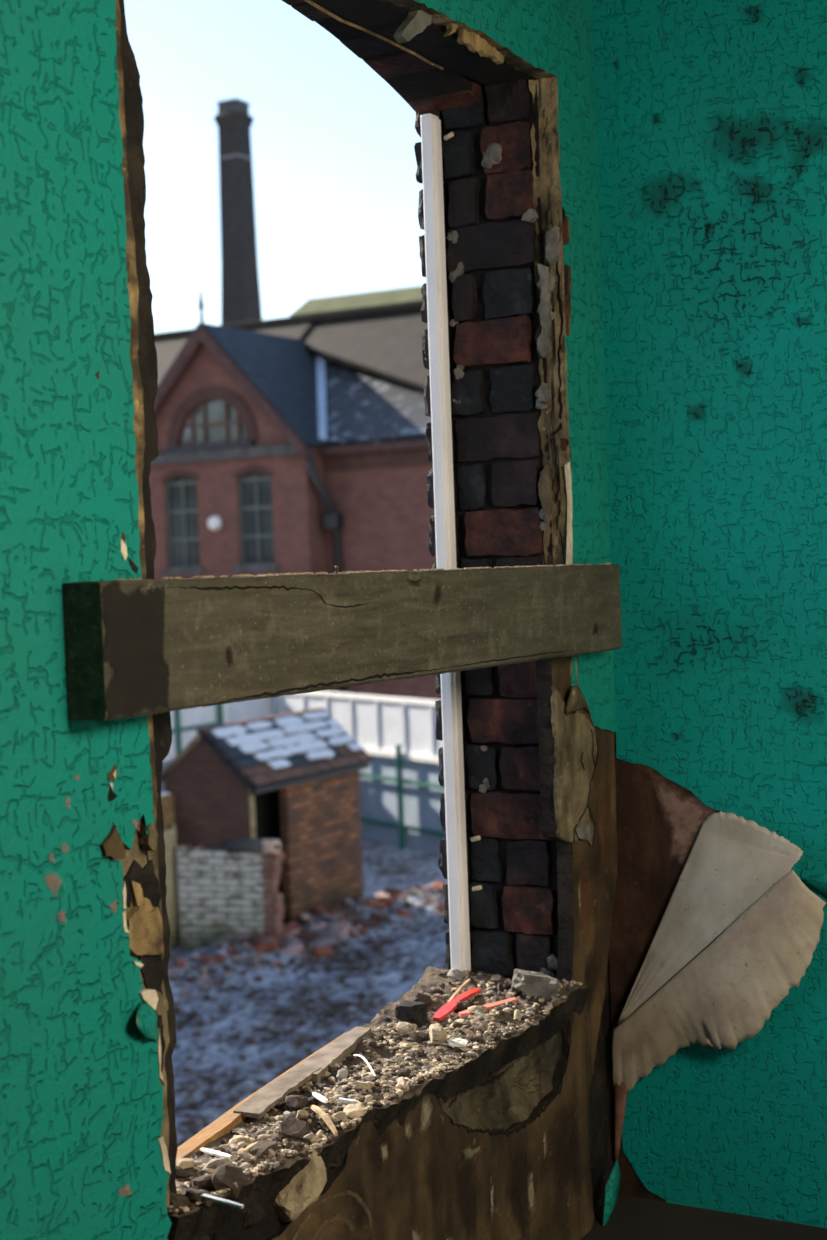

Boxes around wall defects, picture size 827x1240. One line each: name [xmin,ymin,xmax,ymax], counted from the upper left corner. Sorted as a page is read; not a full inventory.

spalling [443,23,505,64]
damp [716,118,827,177]
damp [682,180,795,310]
spalling [521,207,570,358]
spalling [537,383,551,403]
spalling [538,465,553,520]
damp [673,621,733,671]
spalling [107,764,118,802]
spalling [225,838,281,855]
flaking render [265,656,618,1240]
spalling [99,820,171,1207]
peeling [200,1148,231,1158]